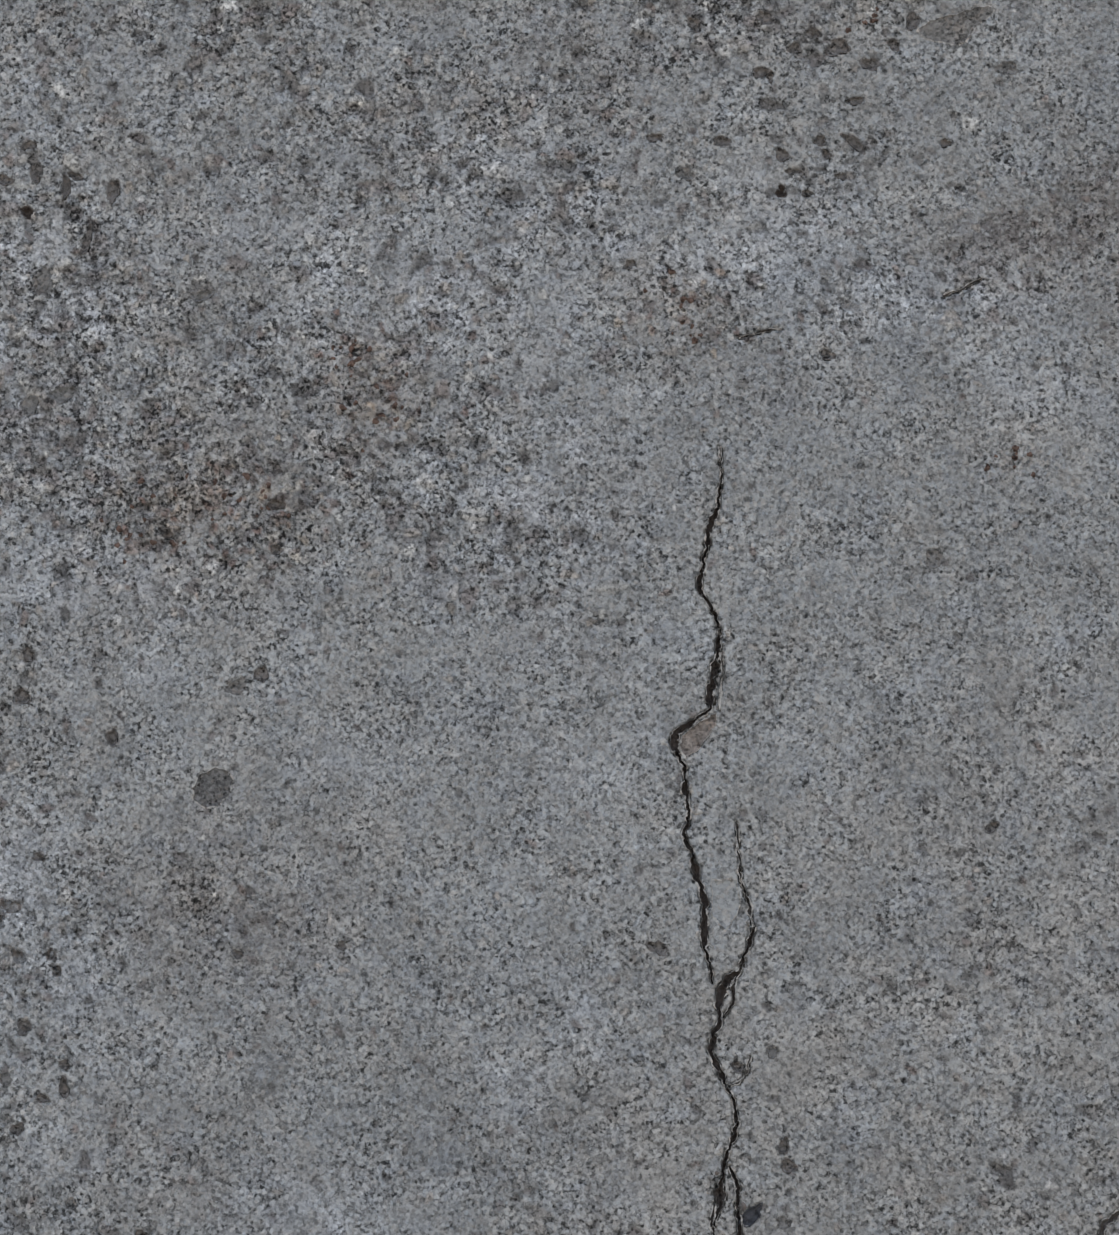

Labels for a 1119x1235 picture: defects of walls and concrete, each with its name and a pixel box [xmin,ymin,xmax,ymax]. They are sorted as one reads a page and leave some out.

crack [660,446,757,1235]
crack [1098,1208,1119,1235]